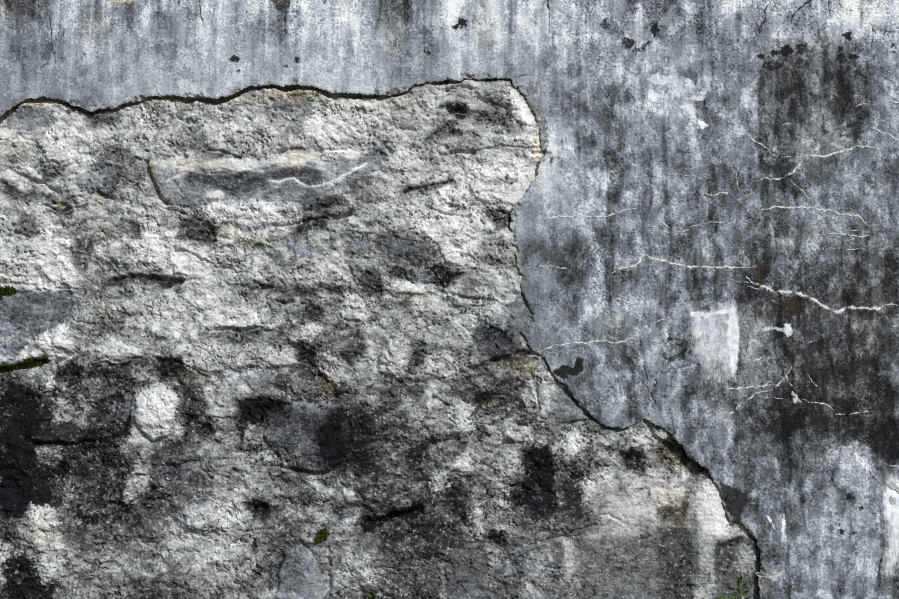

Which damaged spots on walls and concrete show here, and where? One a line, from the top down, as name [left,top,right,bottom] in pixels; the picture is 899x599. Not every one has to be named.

water stain [622,21,660,52]
water stain [647,72,706,111]
water stain [757,43,807,83]
crack [759,0,830,34]
water stain [815,30,863,136]
crack [652,129,897,250]
crack [612,254,897,327]
spalling [0,77,785,599]
crack [538,298,676,400]
water stain [762,323,793,342]
crack [729,369,868,415]
water stain [0,357,185,599]